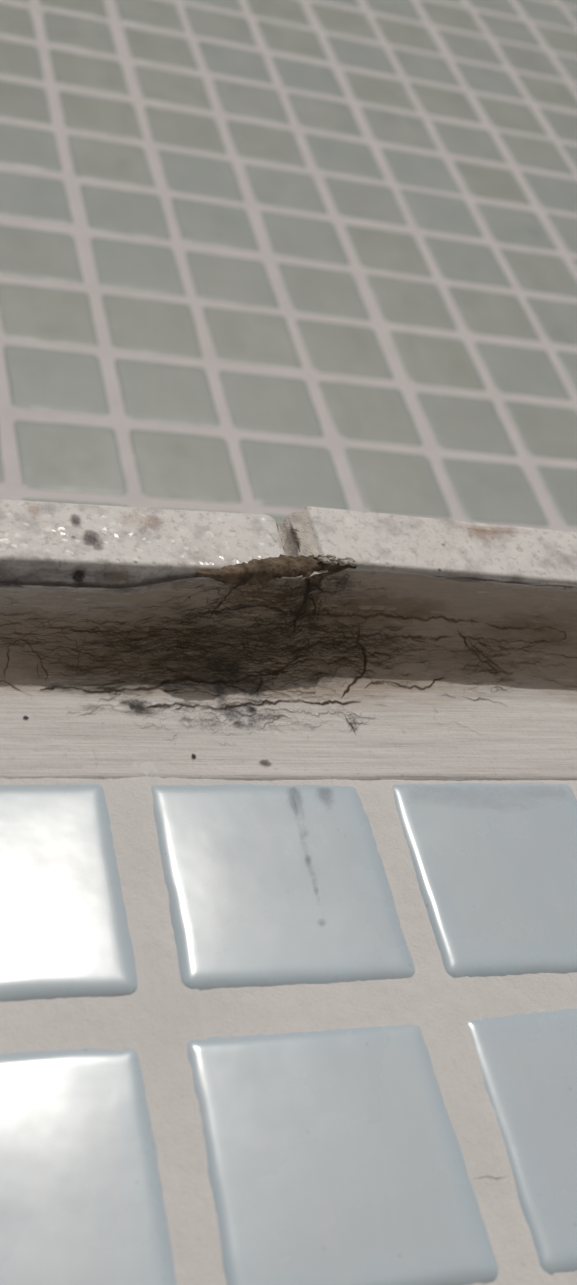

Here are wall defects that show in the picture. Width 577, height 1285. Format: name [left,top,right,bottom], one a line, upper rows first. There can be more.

crack [0,521,577,732]
leakage [0,571,577,725]
spalling [313,553,356,573]